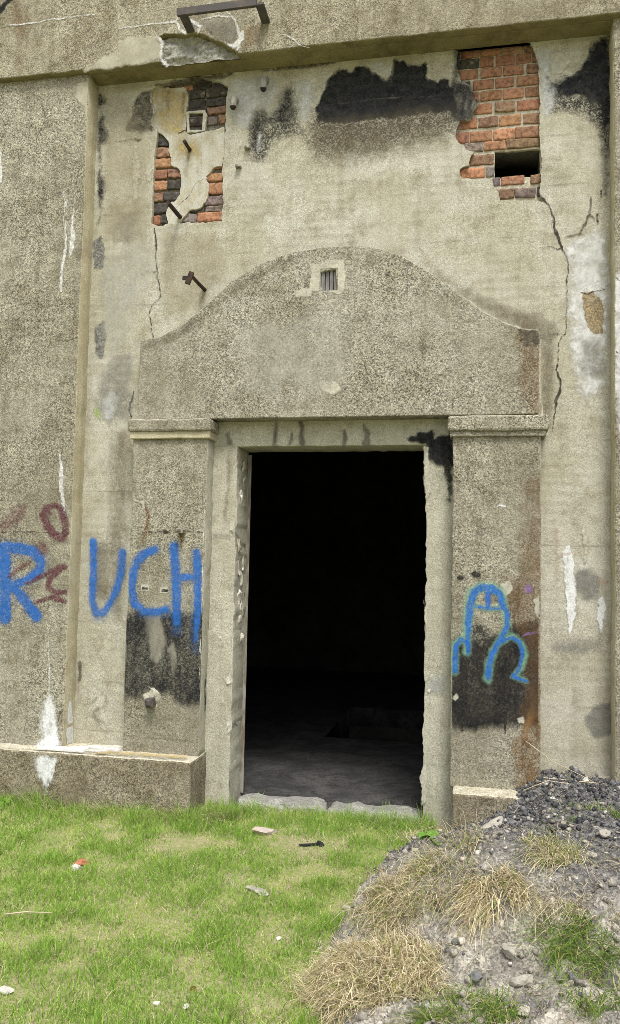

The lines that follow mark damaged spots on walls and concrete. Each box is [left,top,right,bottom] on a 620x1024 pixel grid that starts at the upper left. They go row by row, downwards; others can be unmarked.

spalling [156,22,240,67]
flaking render [132,79,228,226]
water stain [233,62,334,159]
water stain [300,84,454,149]
flaking render [456,45,542,202]
water stain [537,50,609,158]
crack [146,228,161,338]
crack [538,193,569,428]
water stain [443,457,453,501]
rust [500,581,513,596]
efflorescence [36,641,120,786]
rust [516,711,541,785]